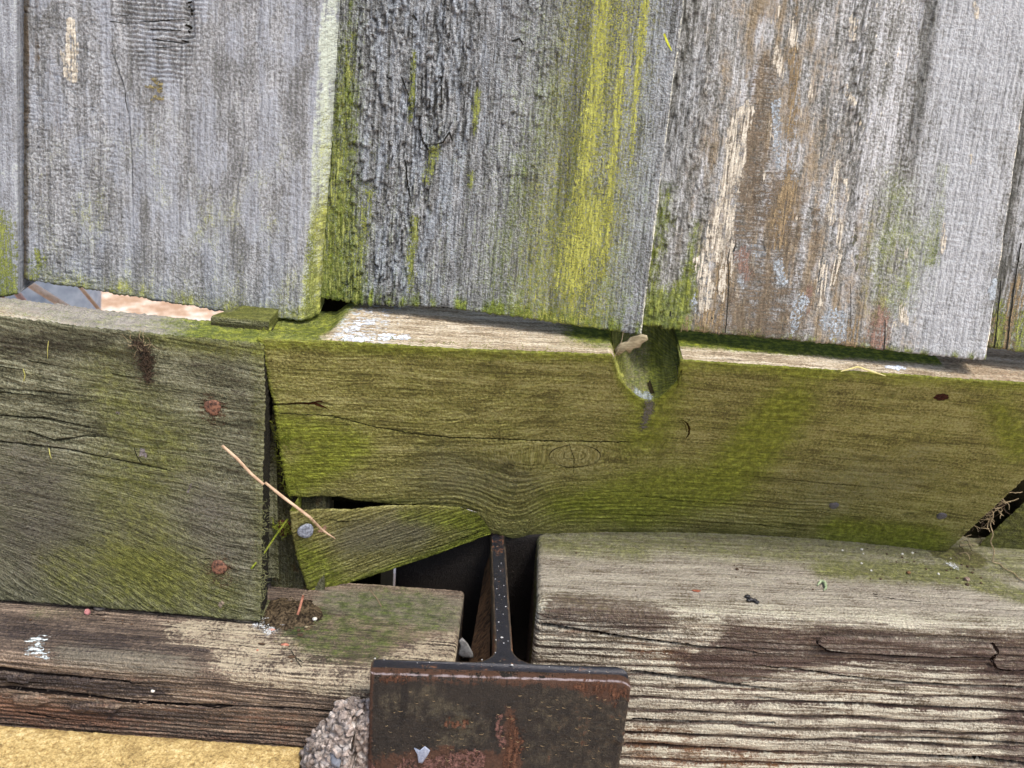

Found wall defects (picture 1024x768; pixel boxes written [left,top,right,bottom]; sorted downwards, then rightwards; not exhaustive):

crack [274,401,626,473]
crack [329,496,485,553]
crack [544,623,687,644]
crack [631,641,1023,687]
rust [570,677,630,708]